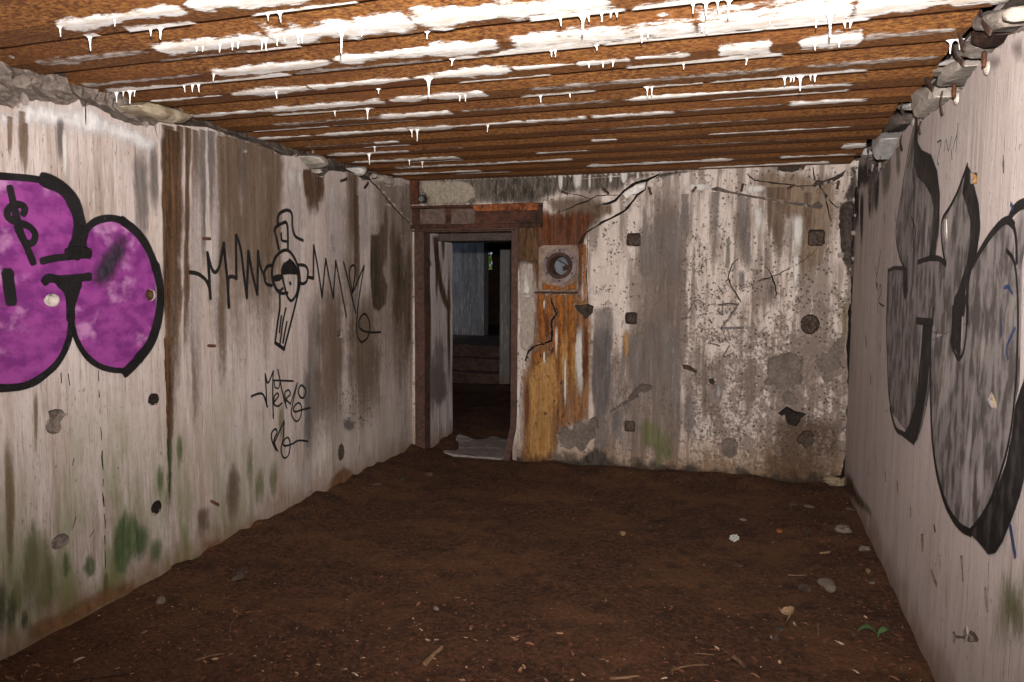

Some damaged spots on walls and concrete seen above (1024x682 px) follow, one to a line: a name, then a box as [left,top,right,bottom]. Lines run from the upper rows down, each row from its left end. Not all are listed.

water stain [2,0,1005,489]
rust [473,203,592,462]
crack [525,297,558,362]
crack [557,174,660,310]
crack [747,156,881,431]
peeling [556,383,653,452]
crack [835,459,845,479]
water stain [128,520,161,559]